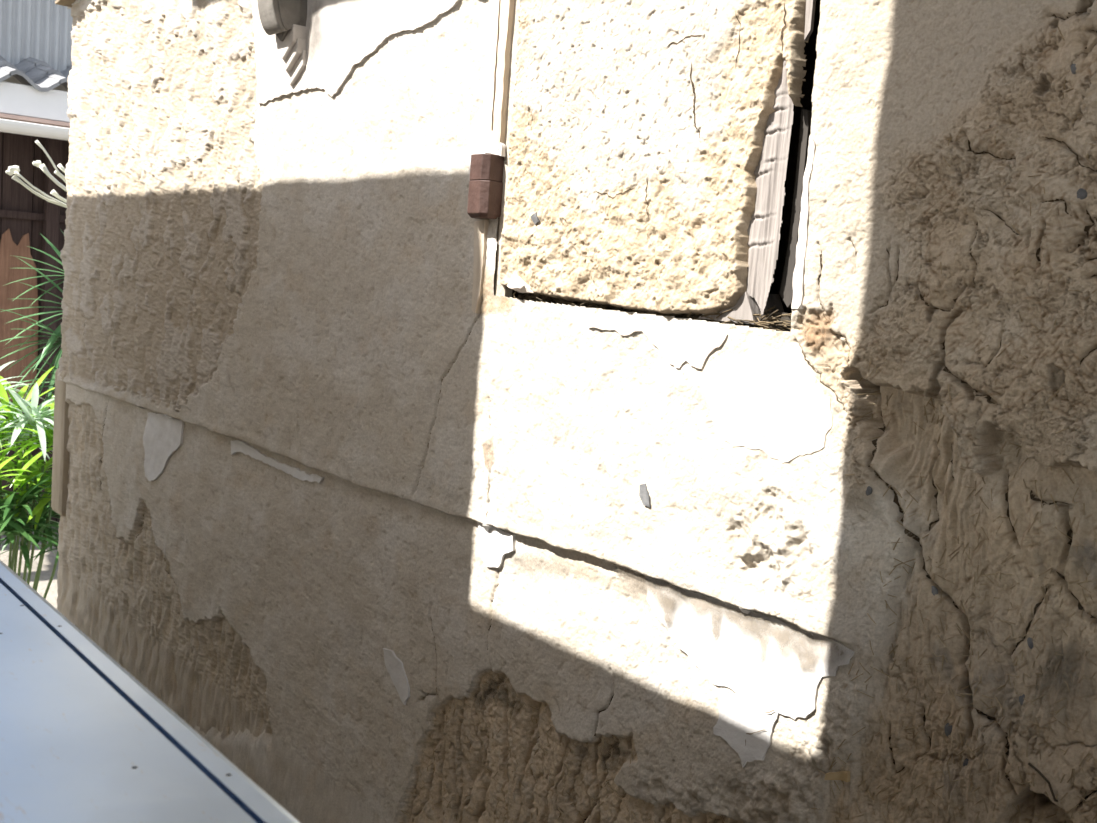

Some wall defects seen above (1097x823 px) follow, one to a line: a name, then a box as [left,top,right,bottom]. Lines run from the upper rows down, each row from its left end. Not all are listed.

crack [779,2,787,55]
crack [667,35,702,138]
spalling [58,0,461,483]
peeling [507,274,534,293]
spalling [57,401,273,737]
peeling [478,522,516,568]
spalling [646,361,1097,823]
crack [868,411,954,579]
crack [1005,476,1073,547]
crack [1012,571,1094,654]
spalling [399,668,743,823]
crack [971,707,1010,781]